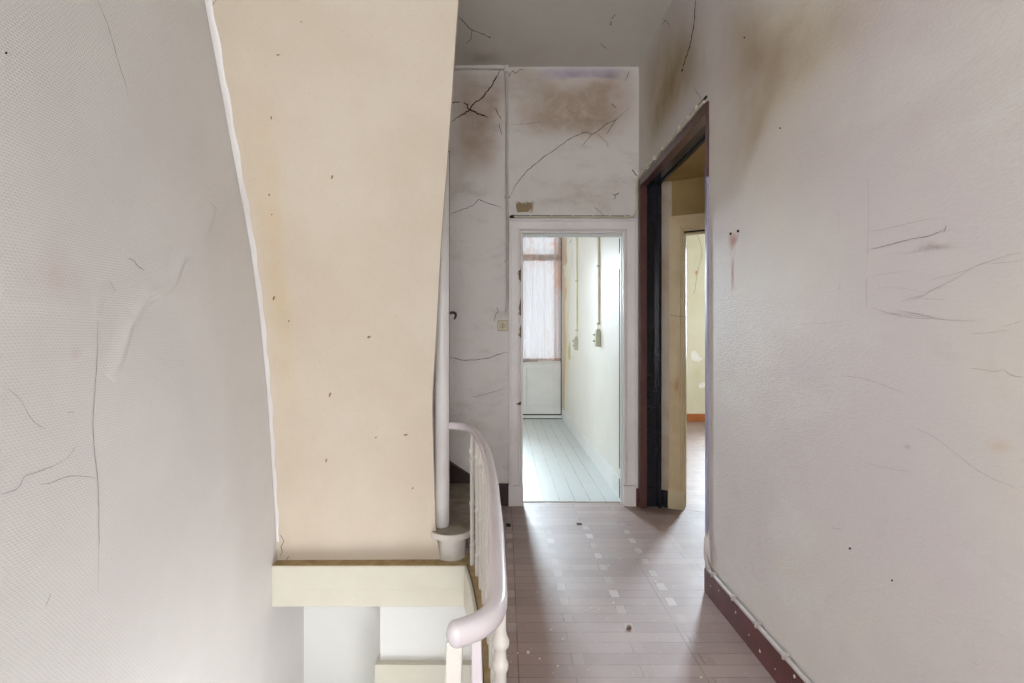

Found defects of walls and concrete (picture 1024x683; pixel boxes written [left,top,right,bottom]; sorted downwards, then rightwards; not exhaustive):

crack [451,69,539,134]
crack [663,0,701,100]
peeling [516,201,534,213]
crack [453,104,628,213]
crack [866,196,1021,334]
crack [3,333,99,524]